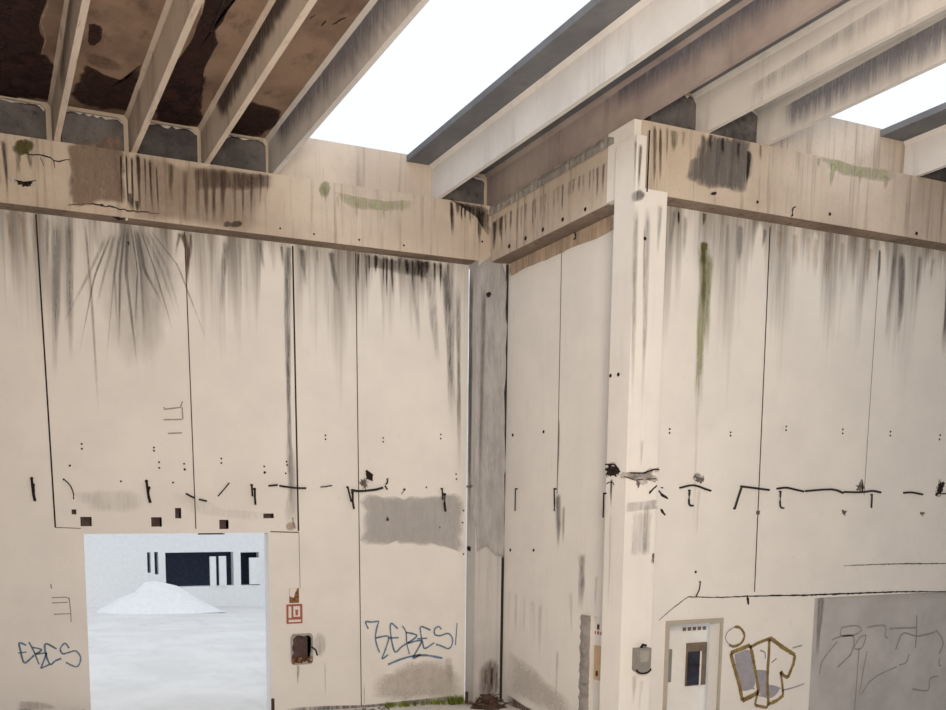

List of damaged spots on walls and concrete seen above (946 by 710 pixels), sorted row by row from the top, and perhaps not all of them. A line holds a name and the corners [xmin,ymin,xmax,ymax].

water stain [619,0,780,98]
water stain [791,21,946,119]
water stain [196,170,264,213]
water stain [689,135,751,195]
water stain [53,231,71,321]
water stain [114,233,149,328]
water stain [177,234,192,275]
water stain [450,201,511,244]
water stain [510,216,612,275]
water stain [701,242,711,291]
spalling [290,633,318,665]